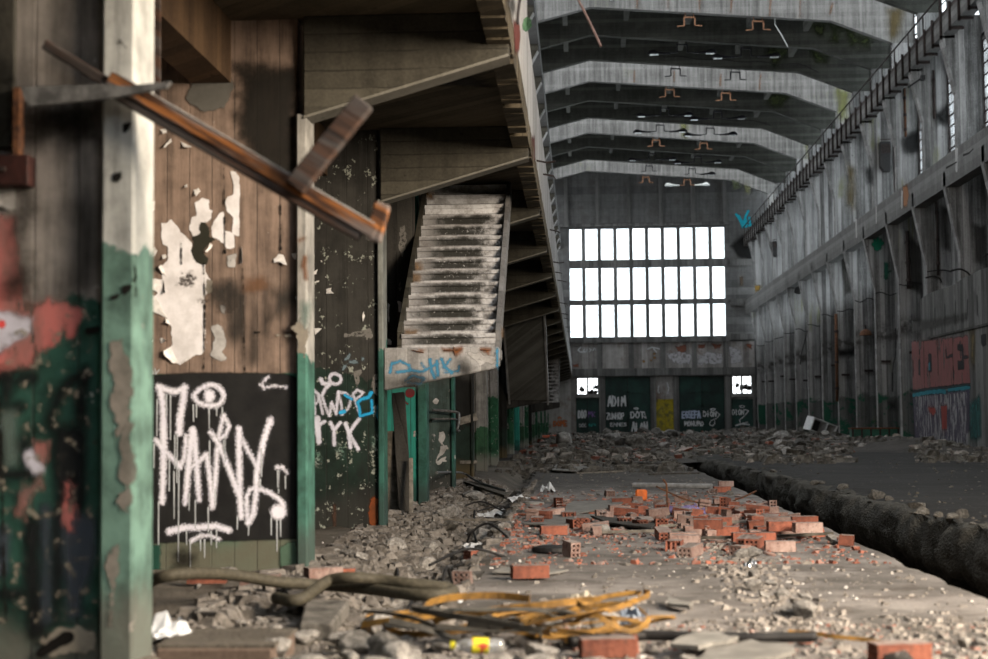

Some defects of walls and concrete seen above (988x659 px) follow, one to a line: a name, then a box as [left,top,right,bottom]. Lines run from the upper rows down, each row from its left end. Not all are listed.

peeling [153,171,243,365]
peeling [15,385,79,438]
peeling [108,338,137,512]
peeling [105,544,120,627]